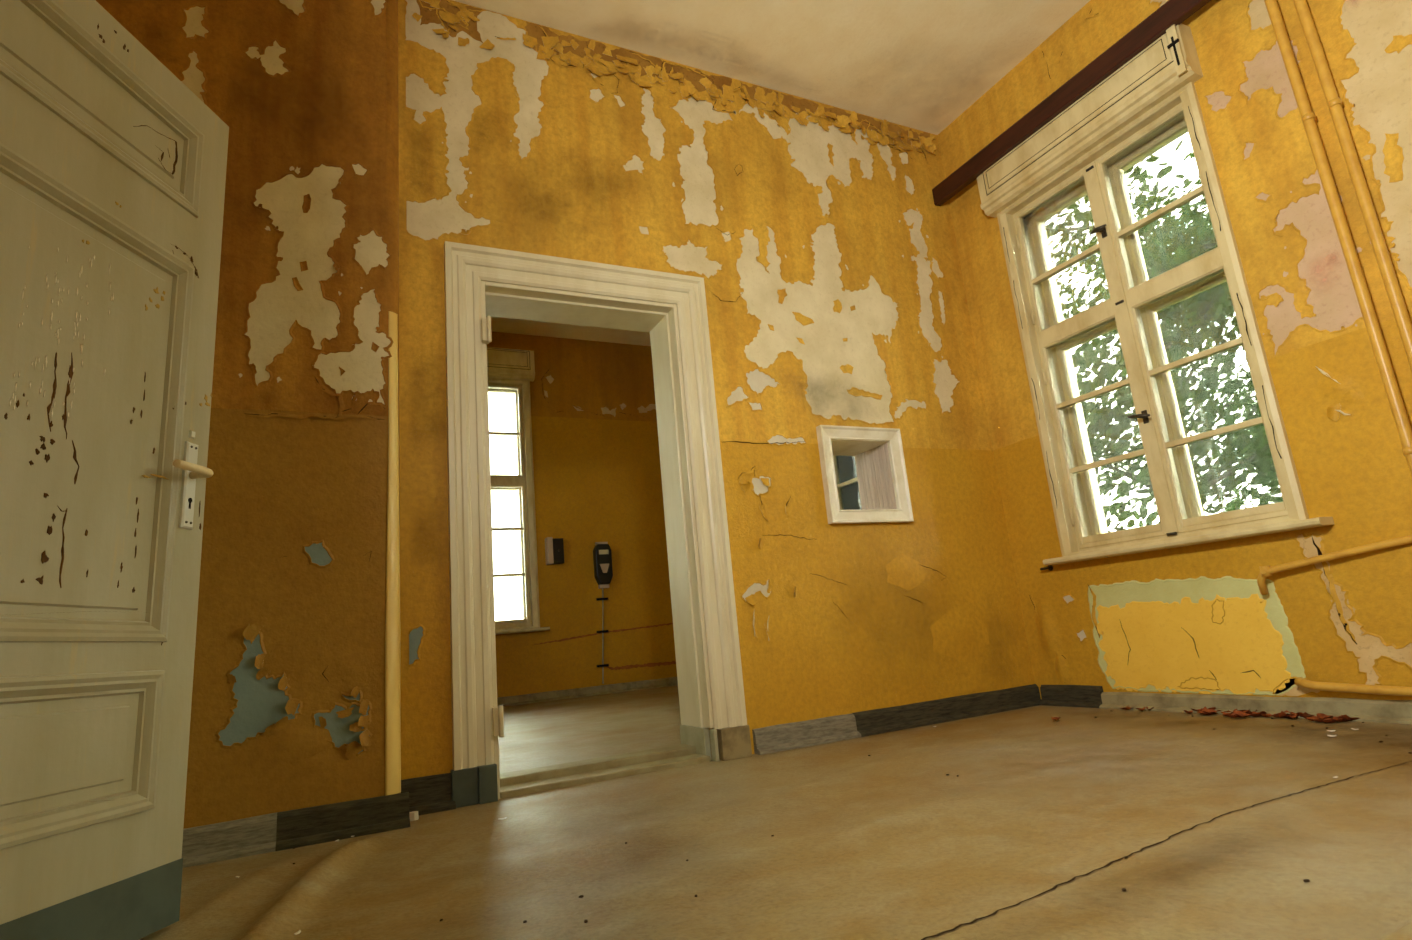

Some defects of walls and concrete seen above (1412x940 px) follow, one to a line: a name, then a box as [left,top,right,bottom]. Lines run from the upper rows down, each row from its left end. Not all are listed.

peeling [179,4,212,105]
peeling [243,39,292,78]
peeling [277,0,307,18]
peeling [368,0,388,17]
peeling [1204,0,1305,120]
peeling [405,0,961,426]
peeling [1253,0,1412,358]
peeling [238,162,393,406]
peeling [215,624,373,760]
flaking render [1273,677,1323,696]